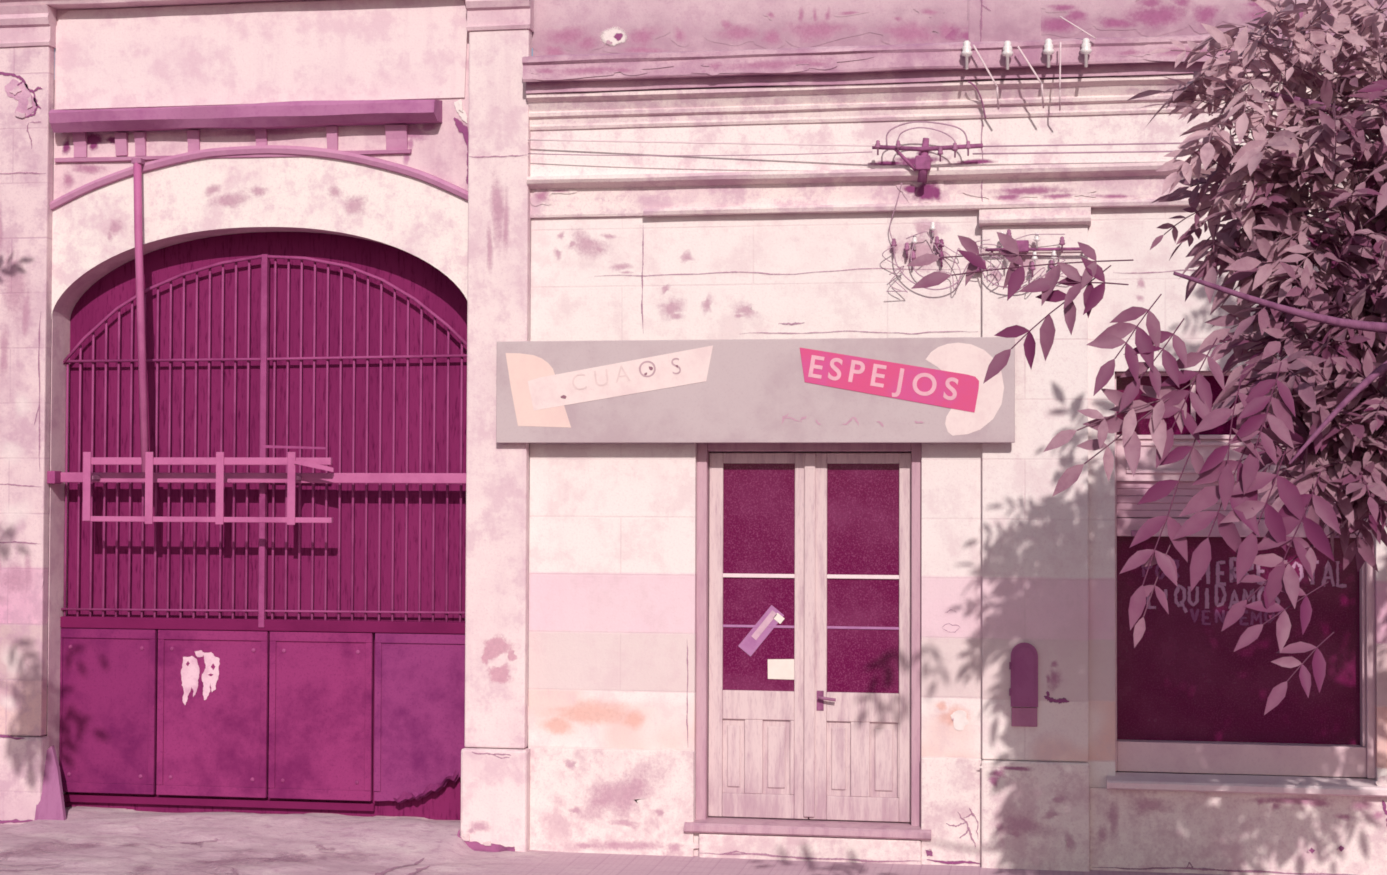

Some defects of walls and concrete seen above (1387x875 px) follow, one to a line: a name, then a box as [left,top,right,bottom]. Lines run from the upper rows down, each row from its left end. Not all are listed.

leakage [530,2,968,80]
leakage [1041,0,1268,61]
leakage [1280,0,1387,30]
peeling [475,628,522,688]
crack [709,808,981,864]